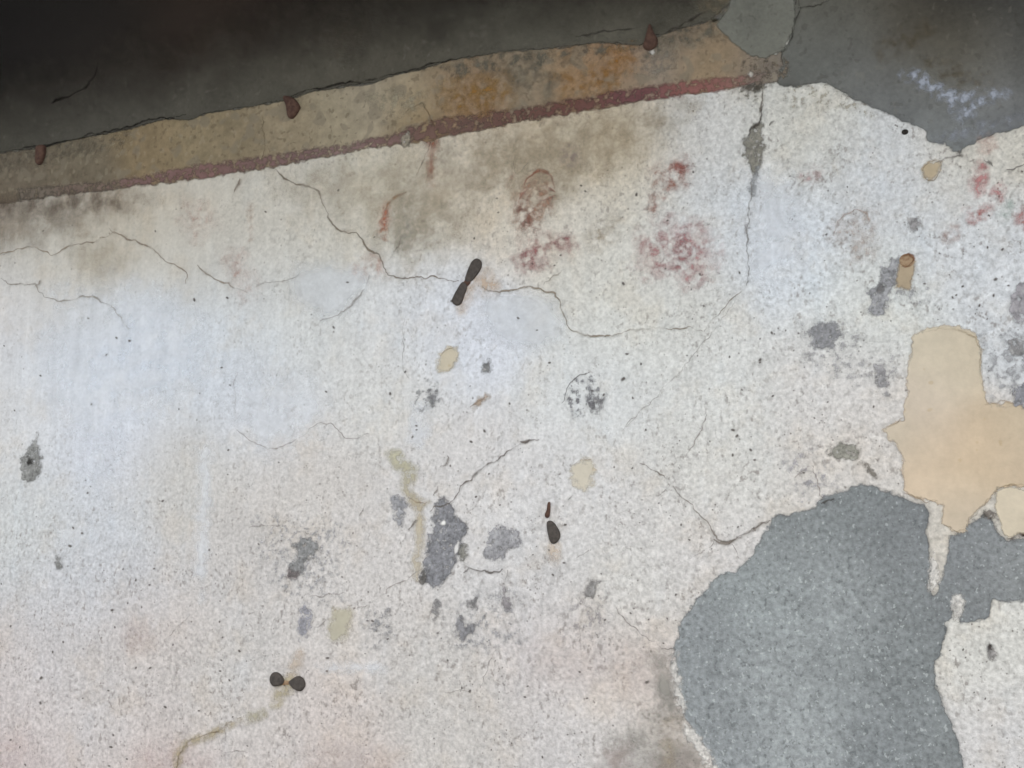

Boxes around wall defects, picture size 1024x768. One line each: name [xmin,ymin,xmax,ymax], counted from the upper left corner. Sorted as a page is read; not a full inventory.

spalling [741,84,766,196]
crack [6,281,129,330]
crack [2,231,232,287]
crack [262,121,628,337]
spalling [990,283,1024,408]
spalling [419,497,469,616]
crack [408,439,535,530]
crack [640,463,770,552]